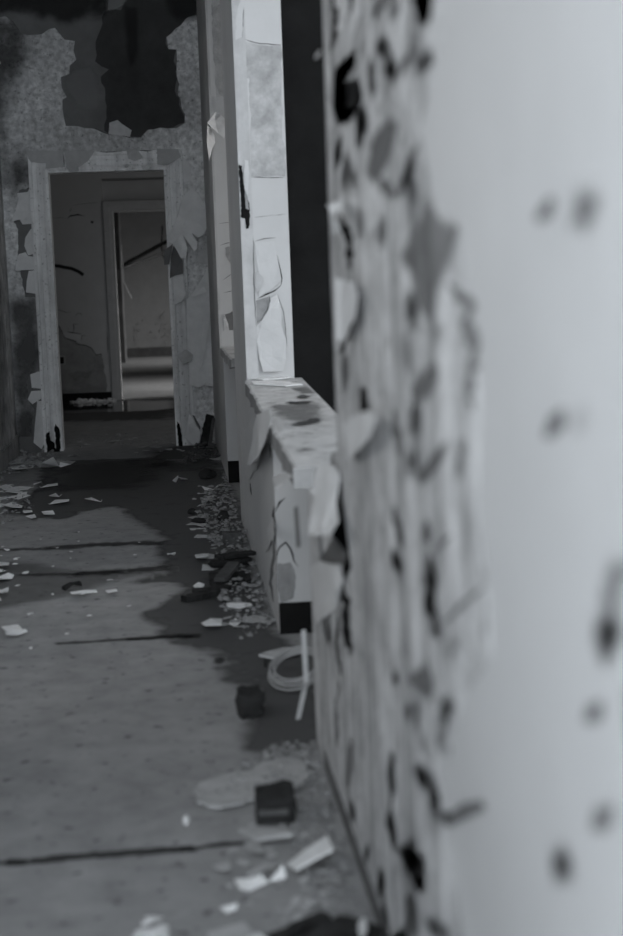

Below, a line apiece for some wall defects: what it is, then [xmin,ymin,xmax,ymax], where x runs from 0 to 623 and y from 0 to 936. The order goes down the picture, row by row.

peeling [0,0,186,138]
peeling [207,0,225,160]
peeling [235,0,286,178]
peeling [12,187,35,297]
flaking render [58,325,107,404]
peeling [8,371,75,469]
peeling [240,409,285,495]
peeling [294,0,492,936]
peeling [133,916,169,936]
peeling [220,903,237,913]
peeling [238,825,292,841]
peeling [235,836,333,891]